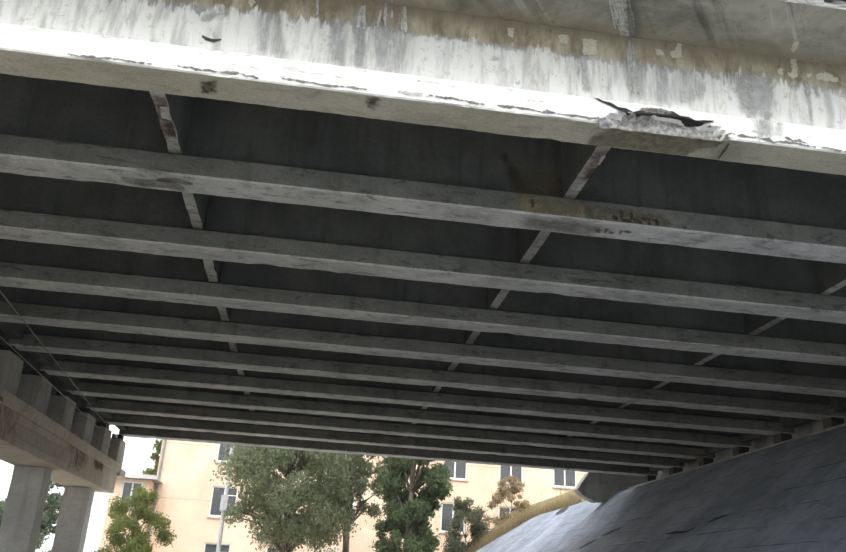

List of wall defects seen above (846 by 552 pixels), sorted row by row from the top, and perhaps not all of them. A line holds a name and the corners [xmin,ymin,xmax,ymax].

damp [354,5,366,66]
damp [375,0,408,65]
peeling [581,38,599,56]
peeling [654,43,684,58]
peeling [778,41,839,82]
spalling [498,98,846,159]
damp [733,73,780,137]